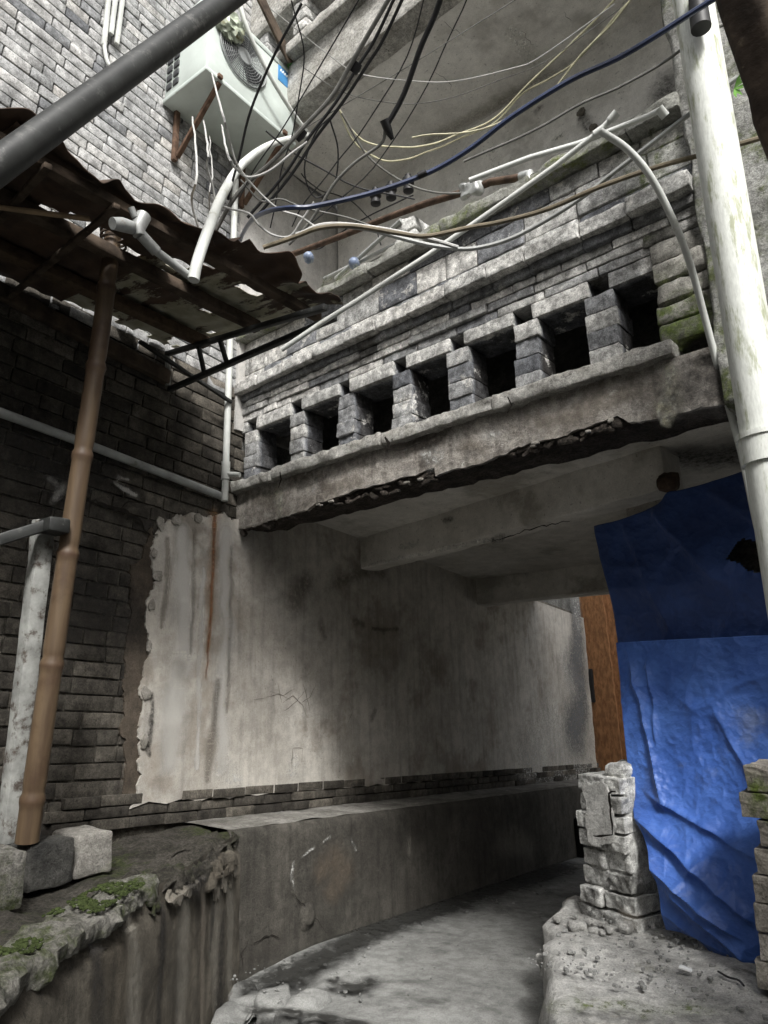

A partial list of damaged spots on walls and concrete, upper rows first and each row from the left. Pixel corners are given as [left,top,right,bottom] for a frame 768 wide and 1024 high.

spalling [506,418,625,459]
spalling [315,470,442,509]
crack [492,521,570,542]
rust [206,515,216,673]
spalling [165,850,238,906]